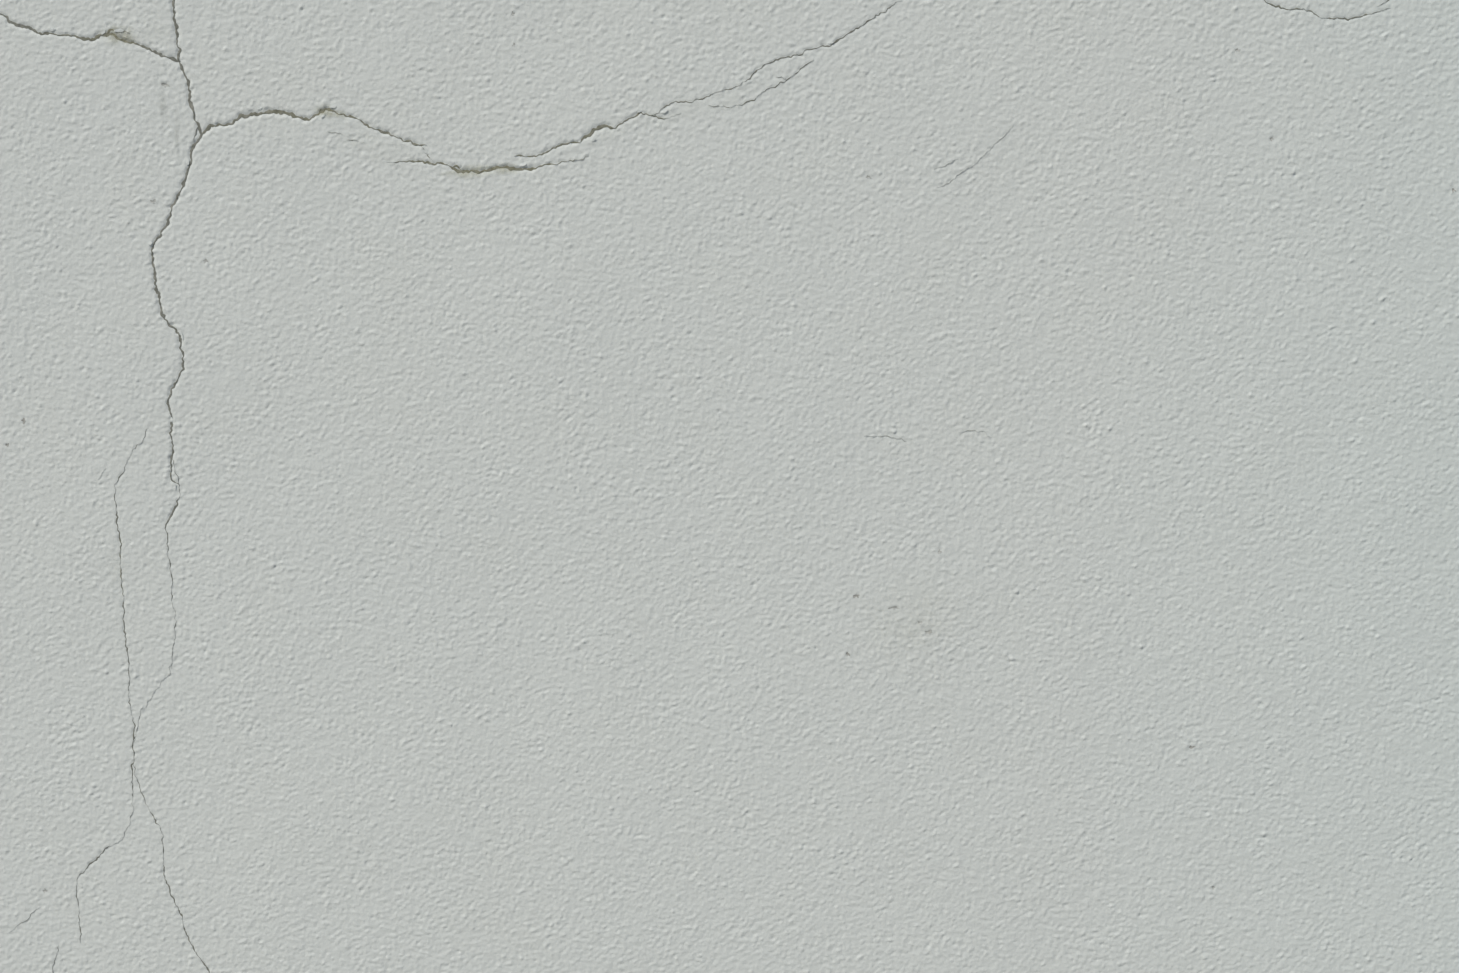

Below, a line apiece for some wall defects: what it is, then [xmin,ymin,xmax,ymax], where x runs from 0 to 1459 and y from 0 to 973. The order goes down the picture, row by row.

crack [0,0,896,973]
crack [1264,0,1389,21]